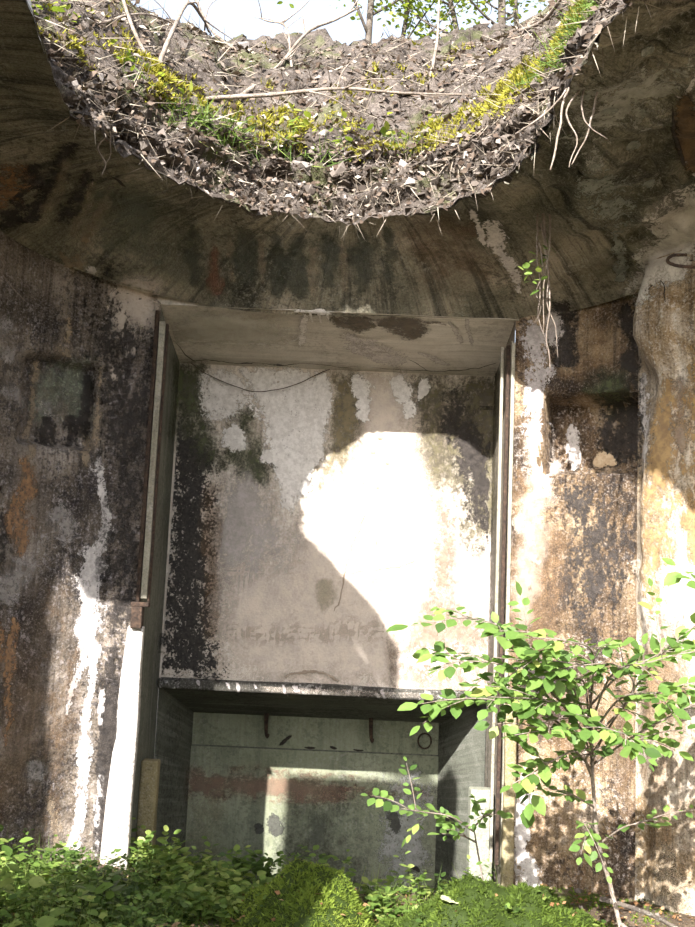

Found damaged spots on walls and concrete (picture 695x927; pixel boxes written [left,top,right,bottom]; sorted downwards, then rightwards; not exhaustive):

water stain [230,227,311,300]
water stain [383,227,397,284]
water stain [347,374,376,423]
water stain [389,375,431,419]
corrosion [5,456,38,557]
water stain [0,359,123,860]
water stain [157,403,301,693]
flaking render [199,366,434,691]
water stain [512,301,695,655]
corrosion [0,617,20,746]